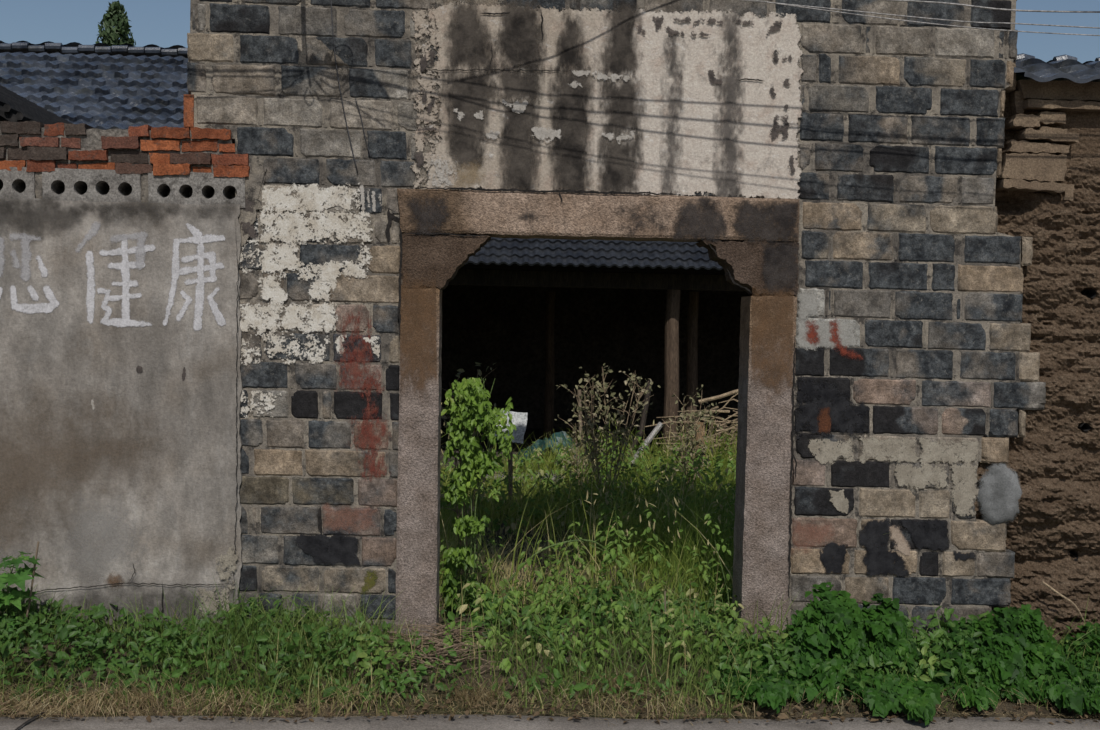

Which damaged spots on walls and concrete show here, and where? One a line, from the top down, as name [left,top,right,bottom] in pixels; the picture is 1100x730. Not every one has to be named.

peeling [419,50,435,72]
flaking render [414,152,457,187]
water stain [443,0,644,194]
water stain [622,13,799,294]
peeling [239,183,382,365]
peeling [240,390,282,419]